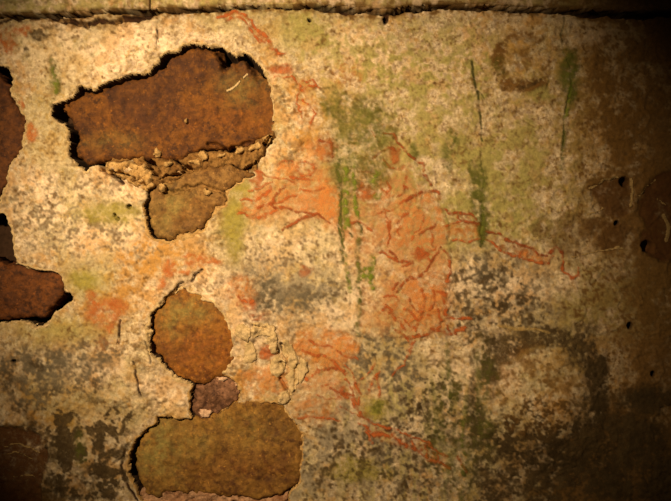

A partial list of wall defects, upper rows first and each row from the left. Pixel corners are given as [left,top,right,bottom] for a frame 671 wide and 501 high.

spalling [0,64,74,330]
spalling [49,41,276,244]
damp [336,159,359,248]
damp [346,257,375,301]
spalling [126,286,309,501]